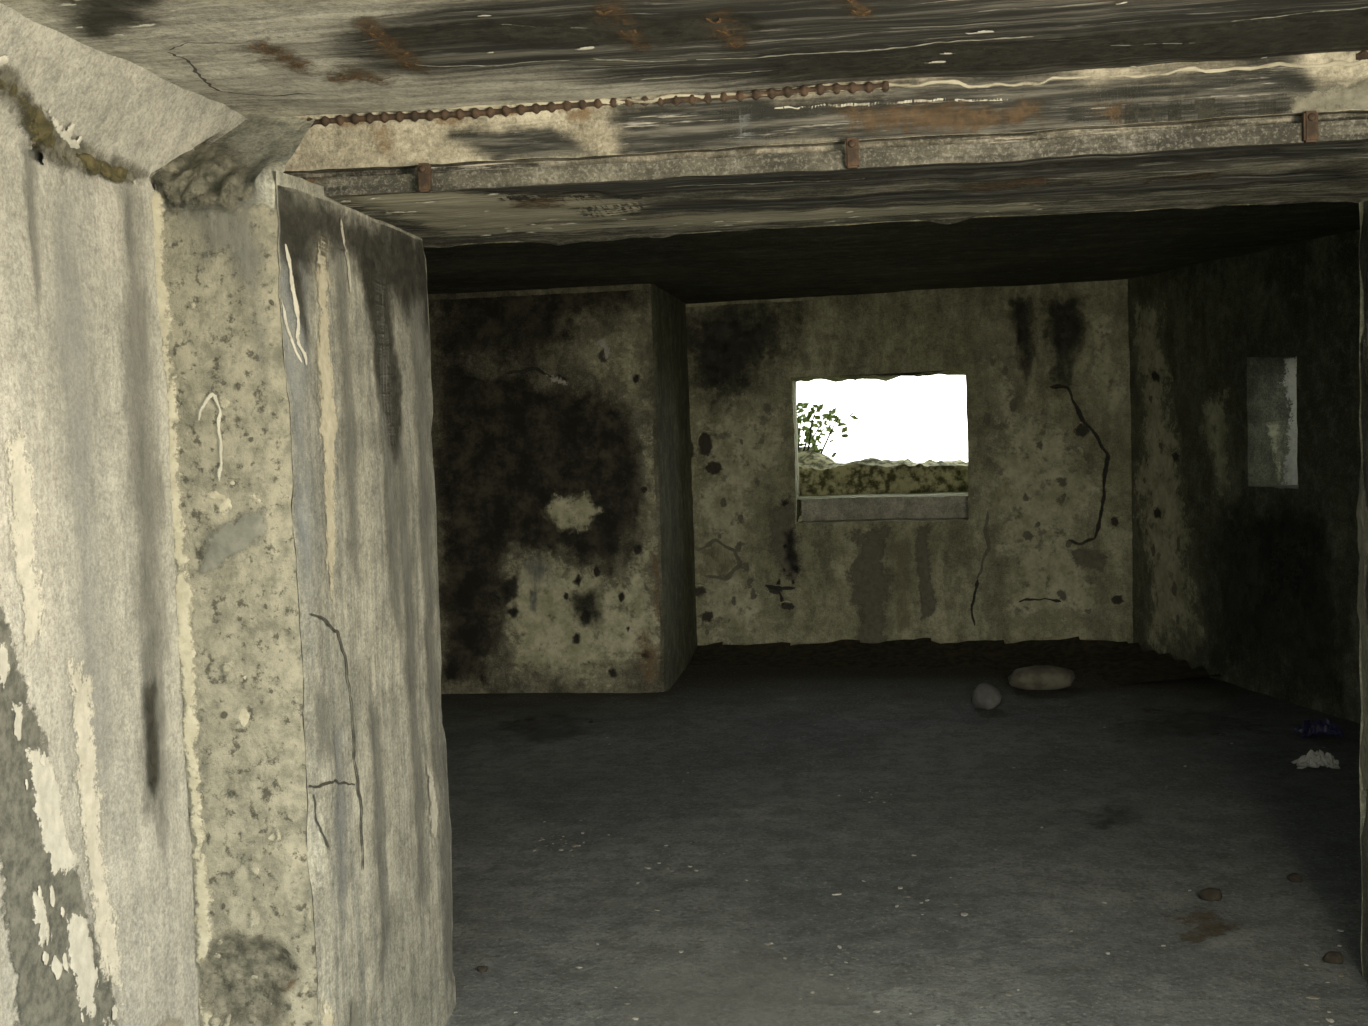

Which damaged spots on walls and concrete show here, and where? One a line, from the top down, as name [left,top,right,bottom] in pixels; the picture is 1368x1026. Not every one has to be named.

spalling [0,54,337,1026]
crack [1050,384,1110,570]
damp [1267,356,1298,485]